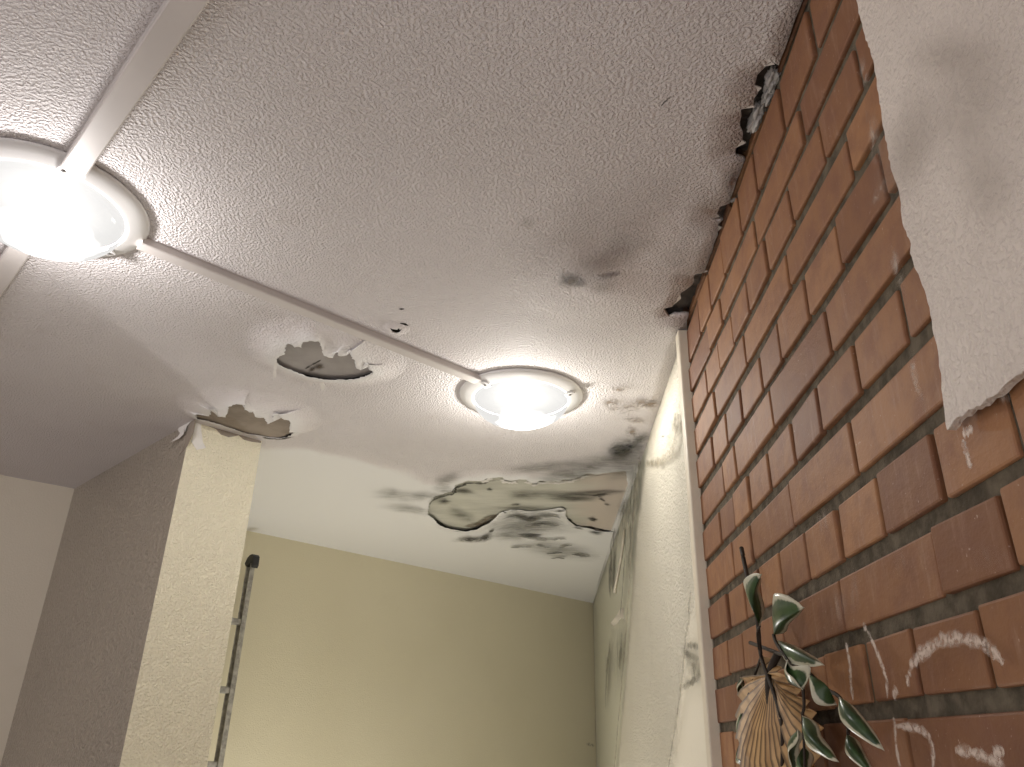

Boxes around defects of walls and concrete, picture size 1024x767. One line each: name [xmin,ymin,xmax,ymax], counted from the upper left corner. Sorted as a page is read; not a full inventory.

spalling [736,62,781,151]
leakage [563,276,578,285]
spalling [666,270,707,316]
peeling [244,316,407,390]
peeling [171,387,321,456]
leakage [428,471,640,559]